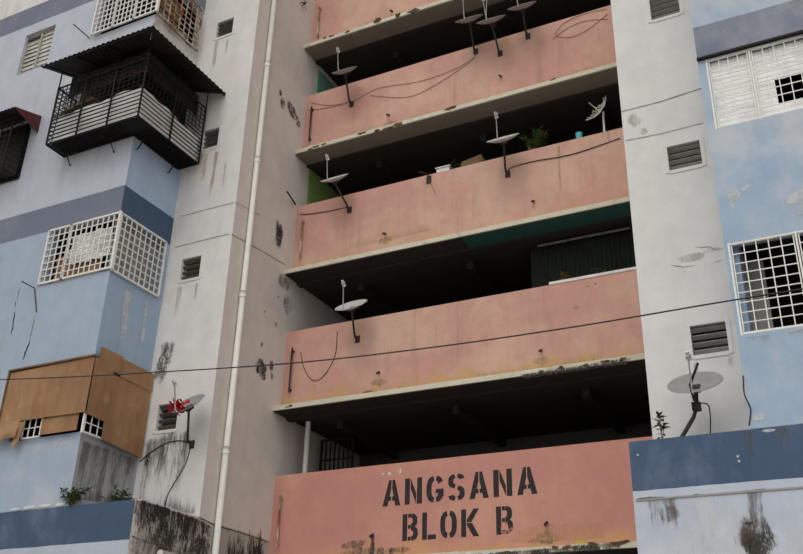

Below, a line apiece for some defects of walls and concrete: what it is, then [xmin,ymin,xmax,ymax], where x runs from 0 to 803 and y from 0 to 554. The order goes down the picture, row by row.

water stain [275,221,283,248]
crack [11,286,35,359]
water stain [155,343,173,379]
water stain [256,359,274,380]
water stain [79,442,134,502]
water stain [144,432,187,476]
water stain [131,499,212,554]
water stain [227,531,264,554]
water stain [342,536,406,554]
water stain [479,524,619,554]
water stain [740,493,775,554]